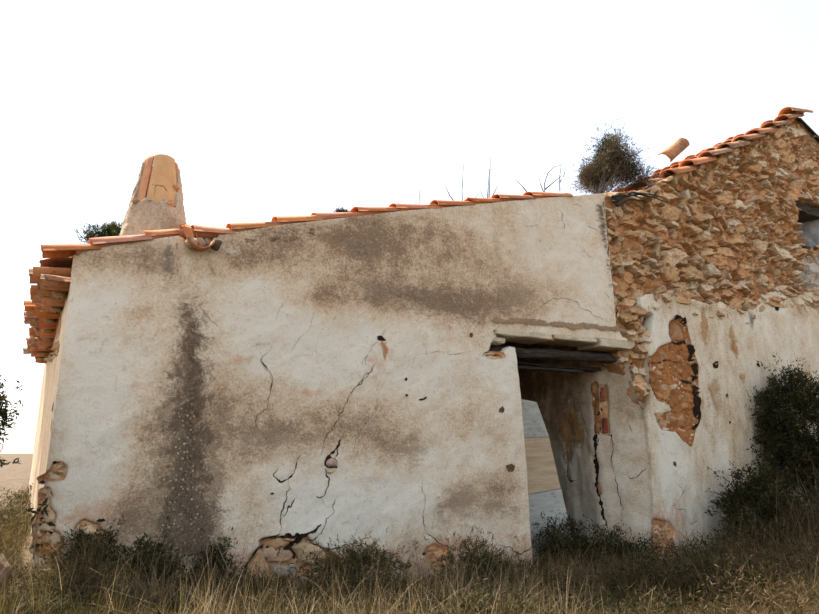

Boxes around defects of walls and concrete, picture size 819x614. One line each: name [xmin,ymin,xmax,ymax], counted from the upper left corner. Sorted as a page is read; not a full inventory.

flaking render [604,117,819,447]
flaking render [29,461,68,565]
flaking render [74,518,114,547]
water stain [129,295,230,567]
crack [273,455,301,529]
flaking render [238,524,342,584]
crack [308,330,386,550]
flaking render [591,381,610,435]
crack [567,399,646,528]
flaking render [649,518,677,559]